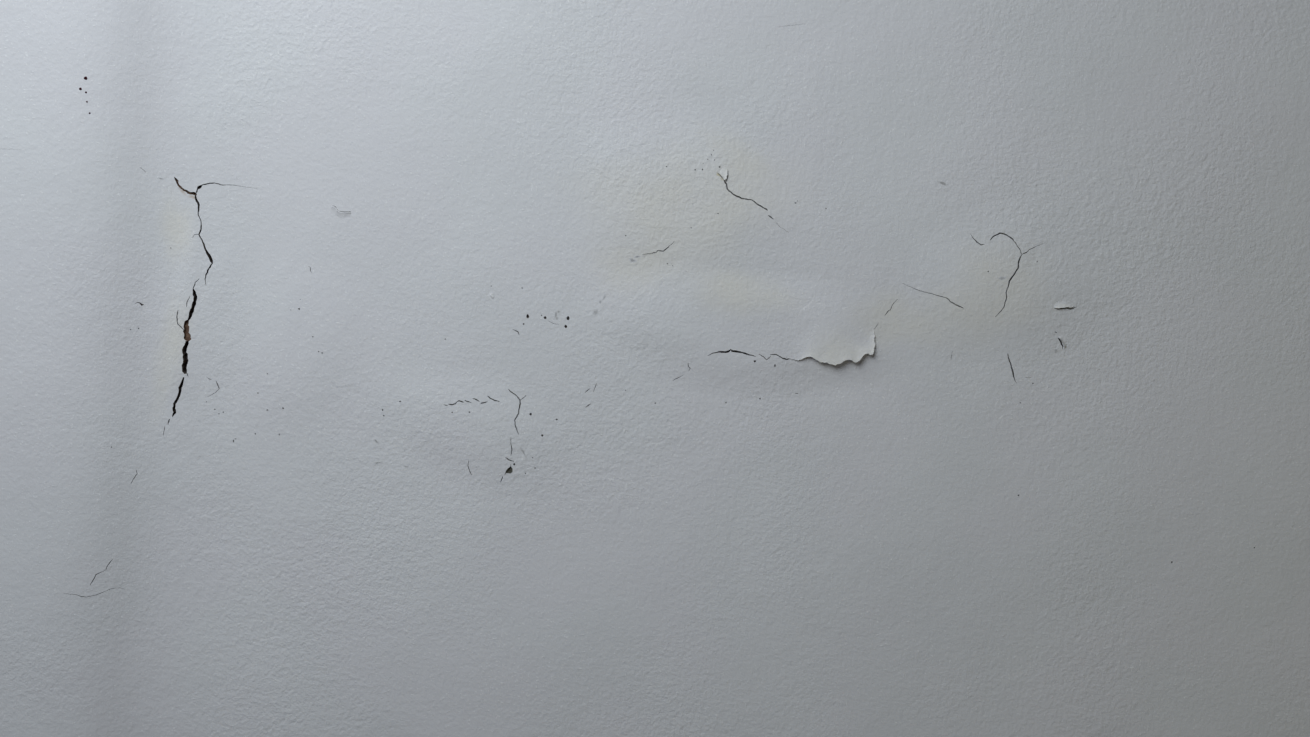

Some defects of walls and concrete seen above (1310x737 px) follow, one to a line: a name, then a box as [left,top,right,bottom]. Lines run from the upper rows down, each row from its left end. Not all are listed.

crack [718,173,786,231]
crack [141,168,257,435]
peeling [774,295,875,367]
crack [874,285,963,329]
crack [970,233,1043,317]
crack [445,390,524,462]